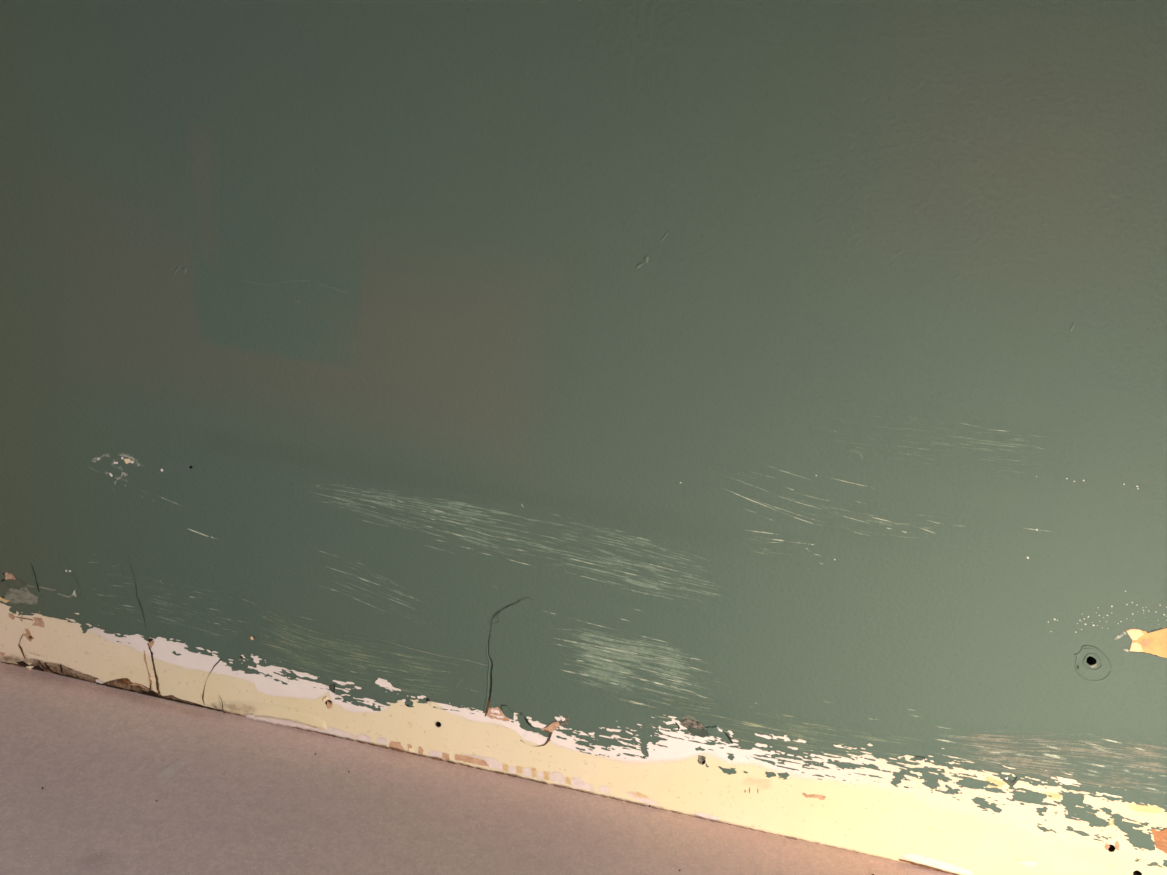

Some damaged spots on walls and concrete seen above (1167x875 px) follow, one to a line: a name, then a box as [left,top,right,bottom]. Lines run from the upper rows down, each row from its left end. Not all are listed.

crack [129,541,160,696]
crack [483,598,533,716]
peeling [0,572,1167,875]